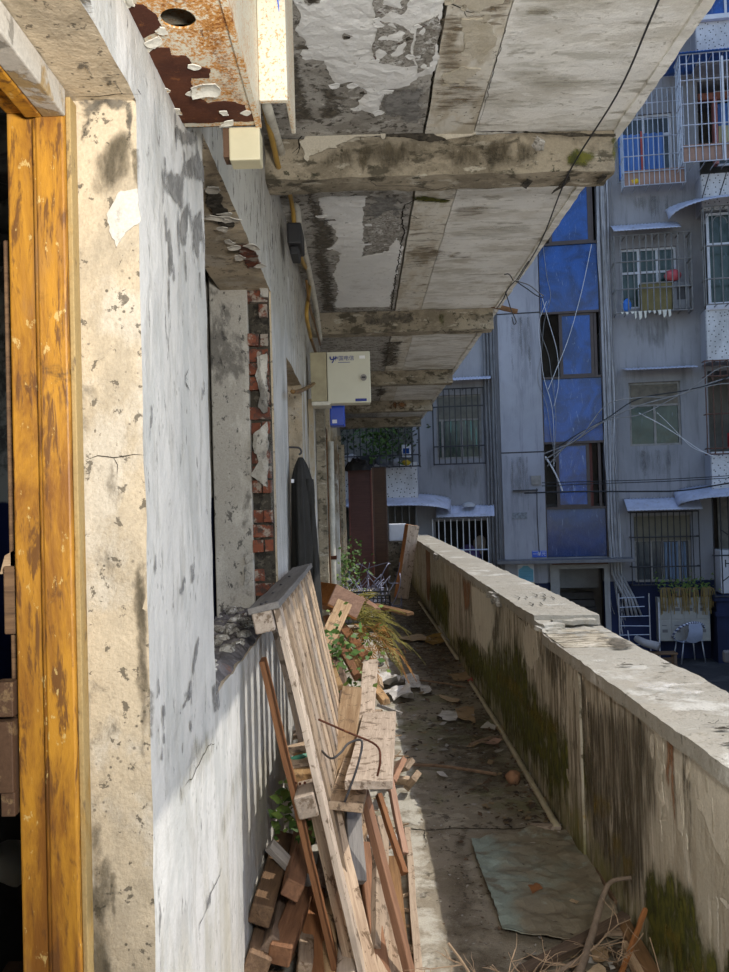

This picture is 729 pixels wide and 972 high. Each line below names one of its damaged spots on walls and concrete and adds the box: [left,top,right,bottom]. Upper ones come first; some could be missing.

corrosion [124,0,254,123]
peeling [293,0,505,116]
peeling [162,108,267,313]
peeling [315,196,404,308]
water stain [345,142,405,170]
water stain [450,140,532,163]
spalling [244,288,276,601]
water stain [581,686,656,897]